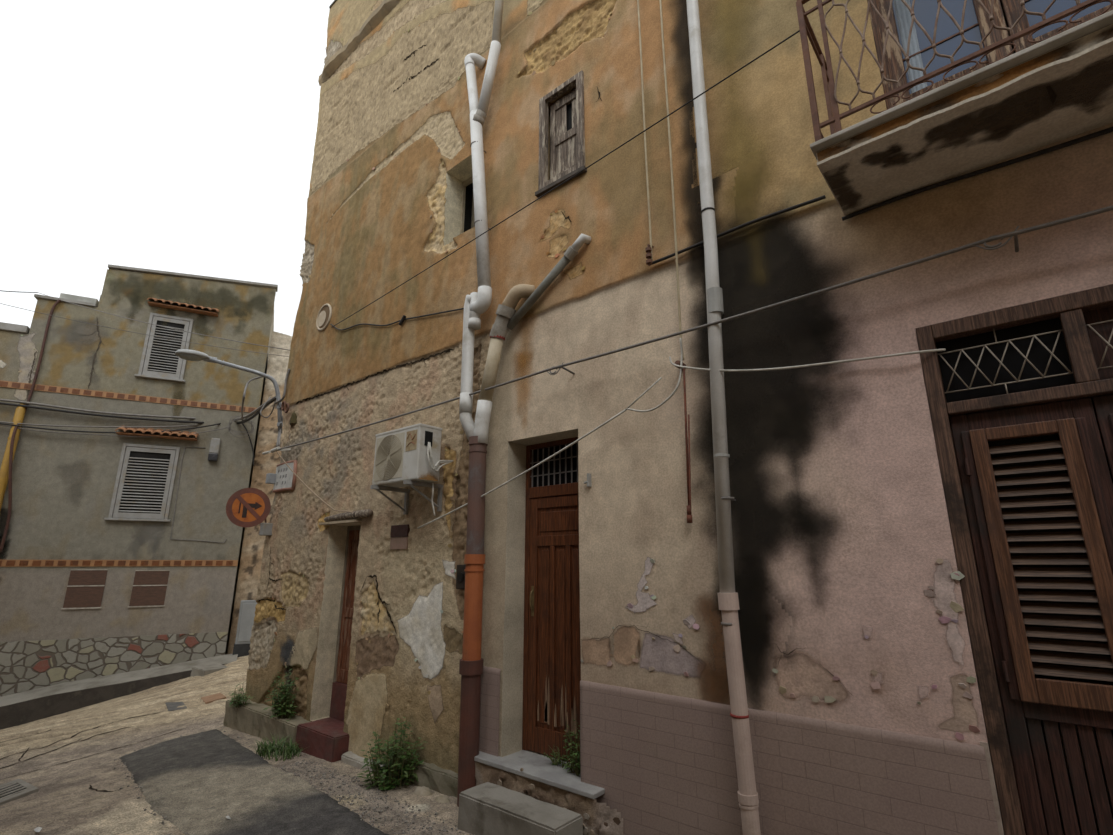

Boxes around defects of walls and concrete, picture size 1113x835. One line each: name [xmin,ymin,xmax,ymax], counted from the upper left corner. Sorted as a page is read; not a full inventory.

spalling [518,0,617,78]
peeling [311,0,494,254]
damp [862,55,1113,168]
damp [823,166,861,211]
spalling [540,209,585,280]
mould [113,278,267,314]
peeling [581,638,612,666]
peeling [924,559,981,741]